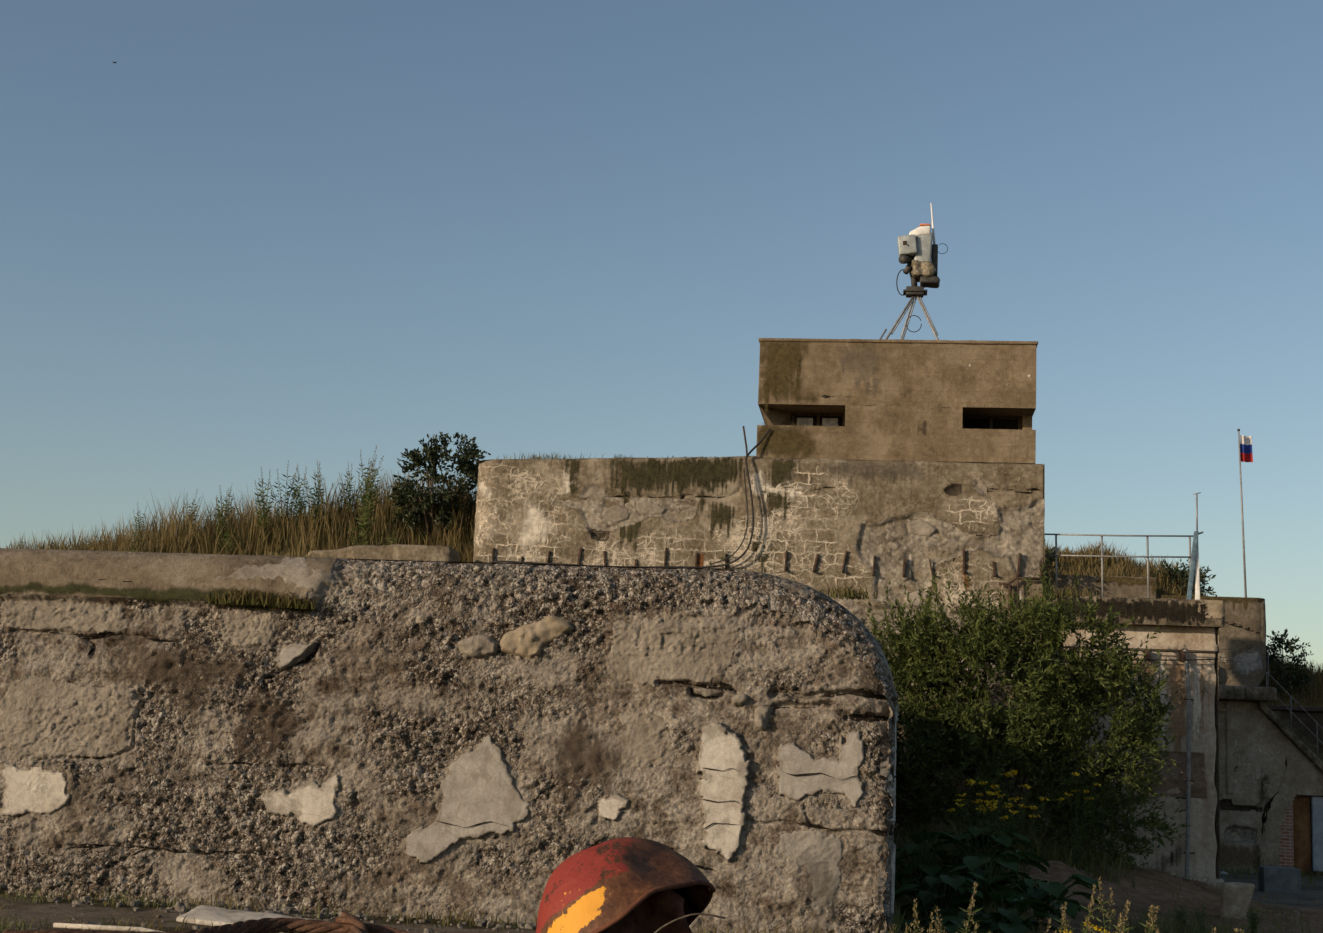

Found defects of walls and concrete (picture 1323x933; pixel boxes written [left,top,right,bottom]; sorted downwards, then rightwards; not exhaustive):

leakage [475,464,579,563]
leakage [581,454,871,590]
crack [16,629,181,655]
peeling [0,674,140,817]
peeling [261,774,340,828]
peeling [406,734,531,864]
peeling [696,722,751,862]